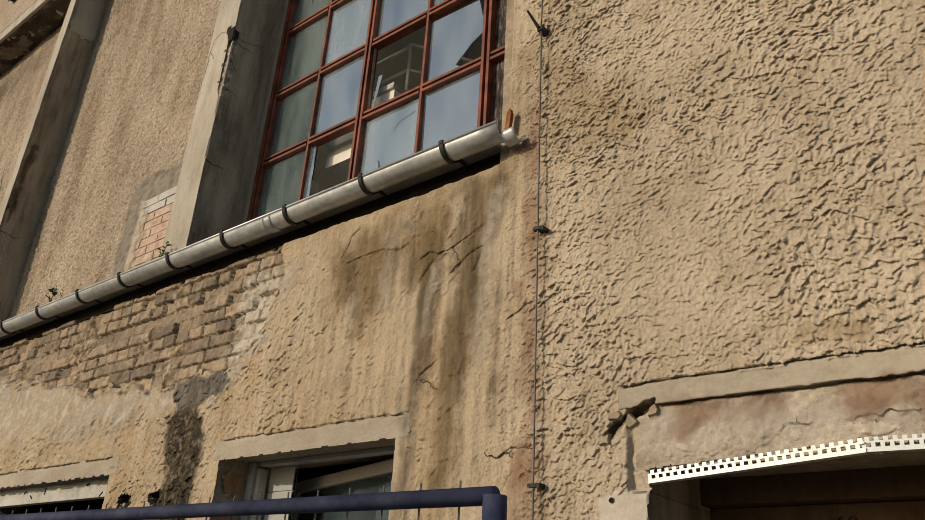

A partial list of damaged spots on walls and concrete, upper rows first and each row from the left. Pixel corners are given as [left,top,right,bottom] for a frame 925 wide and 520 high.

crack [201,32,268,98]
leakage [332,206,449,336]
crack [342,231,481,283]
spalling [0,245,286,399]
leakage [208,266,292,402]
leakage [431,173,507,489]
leakage [0,379,173,440]
spalling [599,397,660,446]
leakage [153,407,203,506]
spalling [116,488,134,508]
spalling [147,487,162,506]